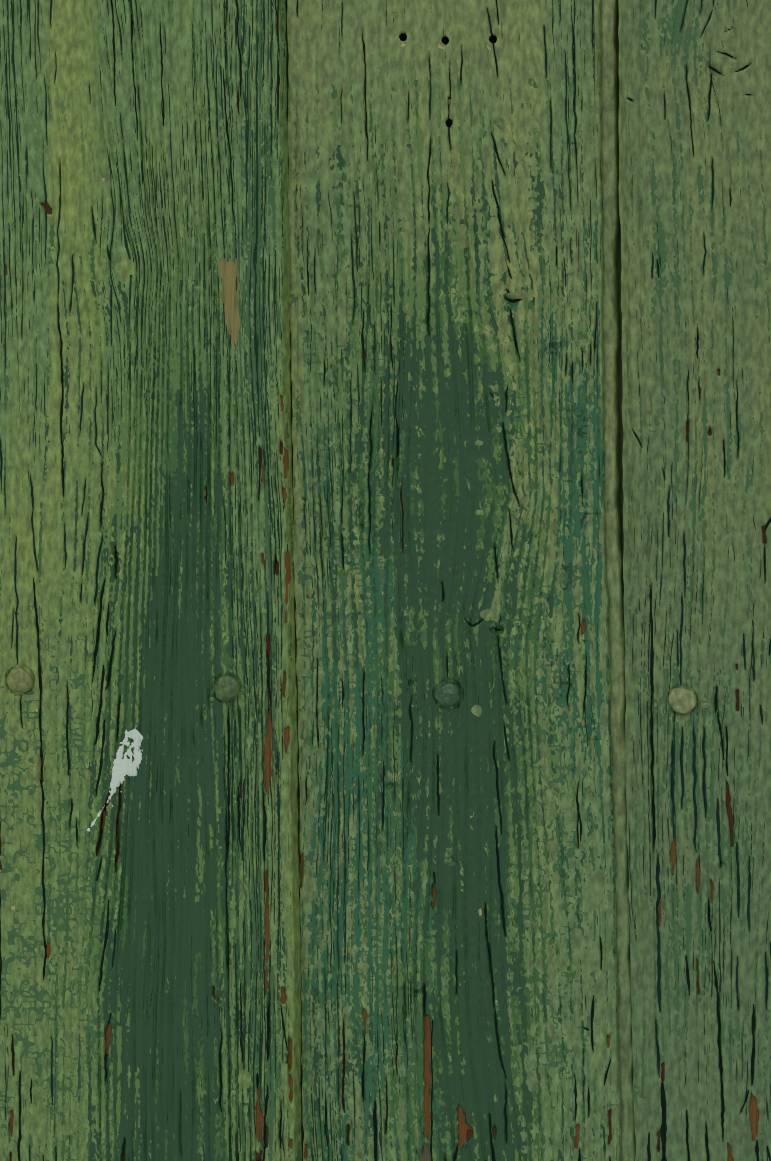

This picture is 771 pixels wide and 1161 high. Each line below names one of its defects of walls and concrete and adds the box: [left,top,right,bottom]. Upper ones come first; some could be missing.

peeling [219,258,242,345]
crack [0,0,458,1161]
crack [408,0,771,1161]
peeling [264,708,290,793]
peeling [416,1015,431,1161]
peeling [458,1105,473,1150]
peeling [750,1094,759,1141]